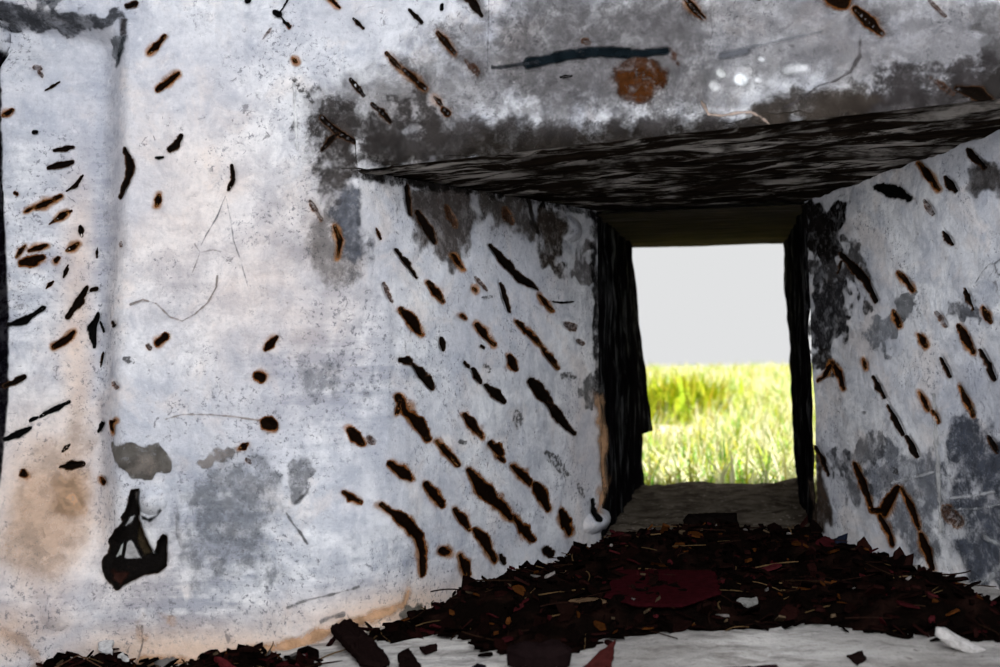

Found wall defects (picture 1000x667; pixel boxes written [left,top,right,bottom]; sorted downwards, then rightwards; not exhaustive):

rust [614,57,668,104]
leakage [709,69,762,91]
leakage [783,65,807,74]
crack [129,205,246,321]
spalling [97,417,172,591]
leakage [826,414,1000,589]
rust [438,546,453,557]
rust [542,545,556,558]